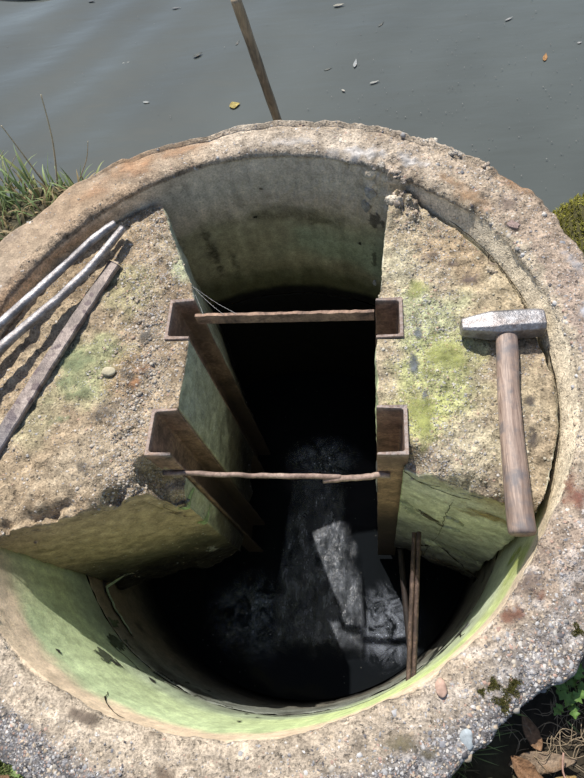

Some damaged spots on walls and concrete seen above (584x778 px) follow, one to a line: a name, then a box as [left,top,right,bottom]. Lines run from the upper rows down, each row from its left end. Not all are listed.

crack [404,465,482,586]
rust [565,483,584,507]